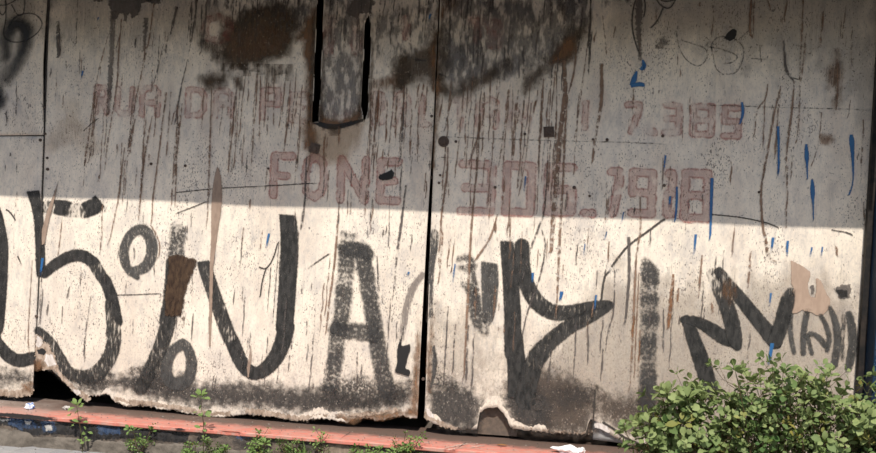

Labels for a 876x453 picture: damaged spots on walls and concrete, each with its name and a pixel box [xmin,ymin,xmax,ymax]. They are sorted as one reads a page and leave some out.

damp [233,291,268,383]
spalling [34,334,91,402]
spalling [0,381,34,398]
peeling [0,413,189,443]
spalling [113,397,231,418]
spalling [245,407,458,430]
spalling [512,423,610,435]